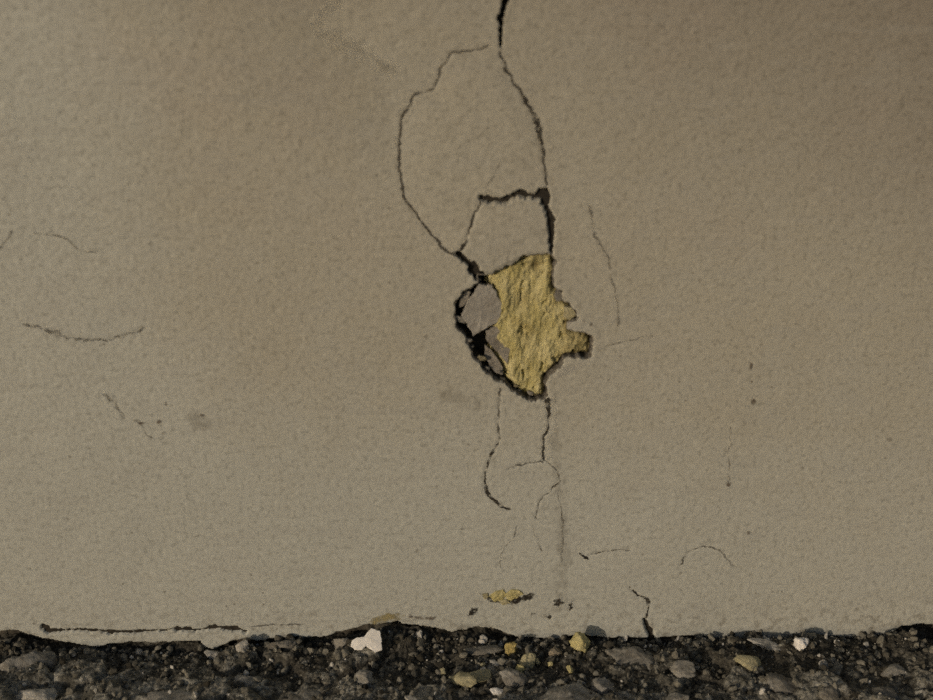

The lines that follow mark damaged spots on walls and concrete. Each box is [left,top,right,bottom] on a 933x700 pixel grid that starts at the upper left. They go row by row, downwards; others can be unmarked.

crack [397,0,556,277]
spalling [454,253,594,401]
crack [484,389,511,510]
crack [517,398,559,518]
crack [632,590,654,639]